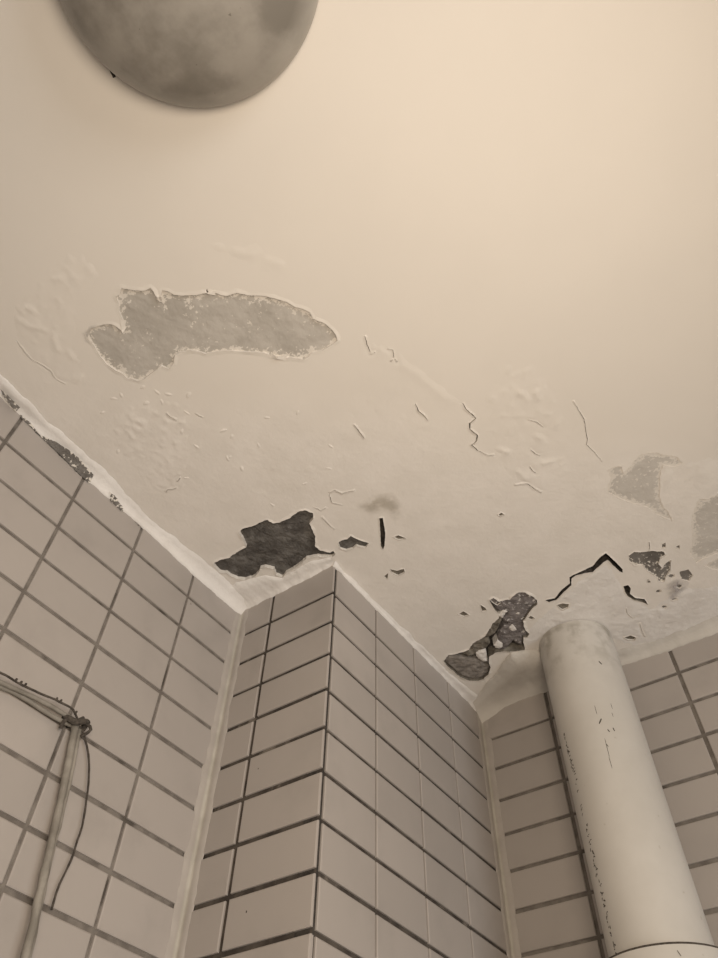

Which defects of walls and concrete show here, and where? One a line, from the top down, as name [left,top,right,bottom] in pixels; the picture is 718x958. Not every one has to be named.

peeling [84,284,341,384]
peeling [608,452,682,520]
flaking render [211,508,370,581]
flaking render [442,590,539,682]
crack [544,552,649,637]
peeling [627,494,718,609]